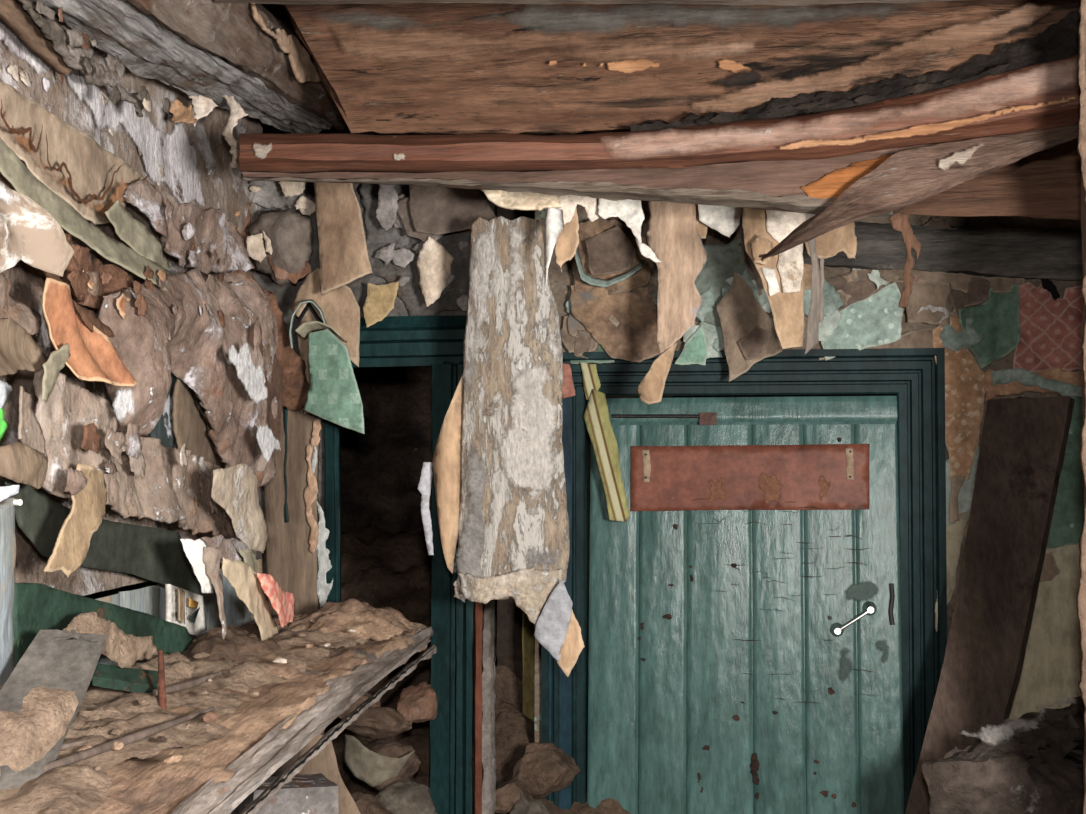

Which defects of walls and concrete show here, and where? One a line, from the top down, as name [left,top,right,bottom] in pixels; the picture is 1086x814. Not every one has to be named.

peeling [0,18,52,92]
peeling [18,0,316,293]
flaking render [0,184,20,204]
peeling [482,190,600,225]
peeling [28,233,167,319]
peeling [360,183,496,332]
peeling [803,264,904,342]
spalling [229,343,267,403]
peeling [263,289,309,410]
peeling [484,293,600,496]
peeling [33,369,241,541]
spalling [255,424,280,462]